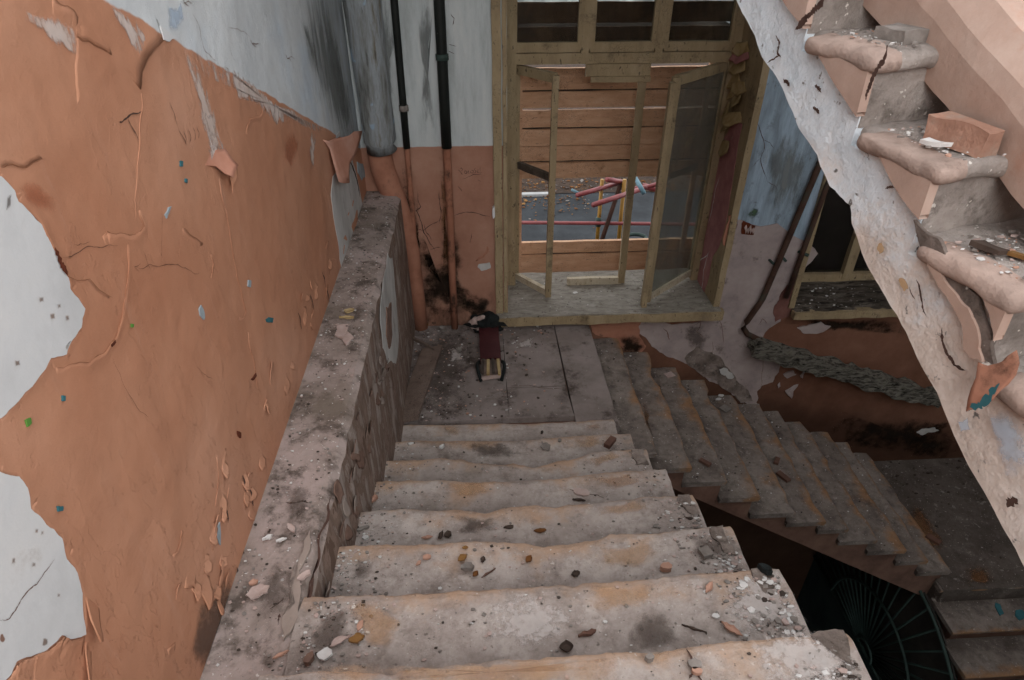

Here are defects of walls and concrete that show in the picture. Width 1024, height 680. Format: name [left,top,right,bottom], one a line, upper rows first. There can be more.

peeling [52,0,175,103]
damp [305,17,348,126]
crack [769,0,824,62]
crack [865,45,888,99]
peeling [0,152,111,427]
peeling [298,131,365,330]
damp [416,184,488,315]
spalling [913,220,948,255]
crack [910,280,965,371]
spalling [927,263,1020,412]
peeling [0,464,104,680]
peeling [176,448,266,615]